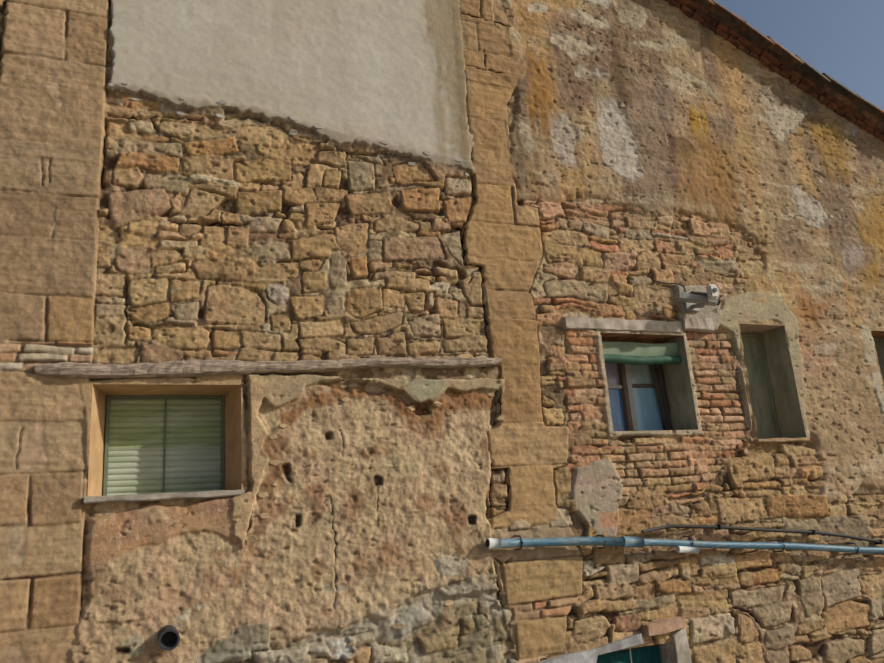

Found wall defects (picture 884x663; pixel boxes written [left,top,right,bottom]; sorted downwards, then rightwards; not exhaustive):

peeling [568,0,612,29]
peeling [618,6,648,28]
peeling [549,33,607,78]
peeling [632,39,716,97]
peeling [520,116,539,154]
peeling [550,113,579,166]
peeling [597,98,643,183]
crack [445,186,489,346]
spalling [245,385,504,542]
crack [330,504,338,602]
spalling [237,578,485,663]